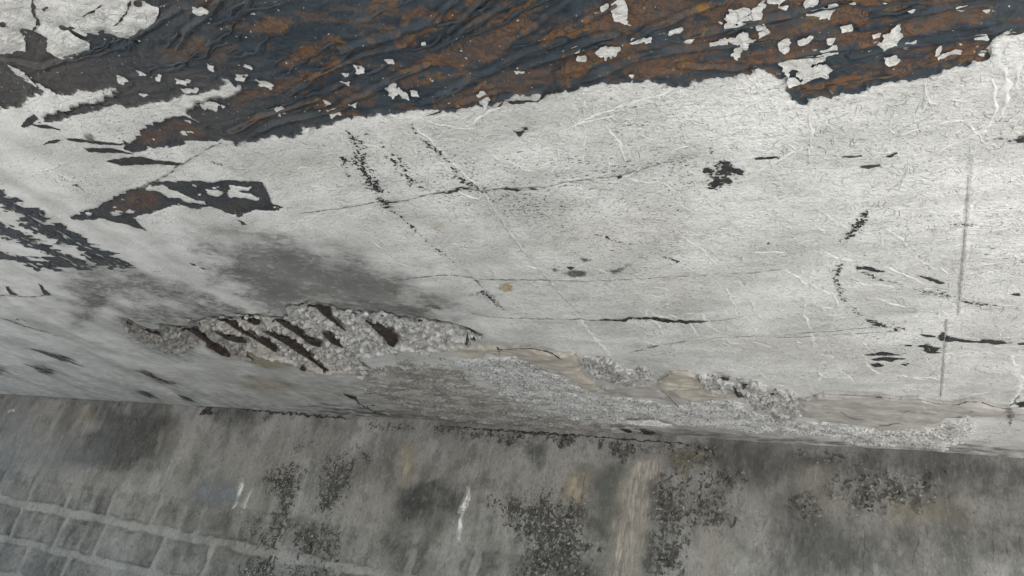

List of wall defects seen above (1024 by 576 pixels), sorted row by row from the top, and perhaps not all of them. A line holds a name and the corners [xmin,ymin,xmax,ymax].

peeling [0,0,1024,166]
crack [299,153,698,214]
peeling [703,162,744,188]
peeling [0,180,283,295]
spalling [118,301,976,452]
crack [786,327,902,338]
peeling [867,332,1024,367]